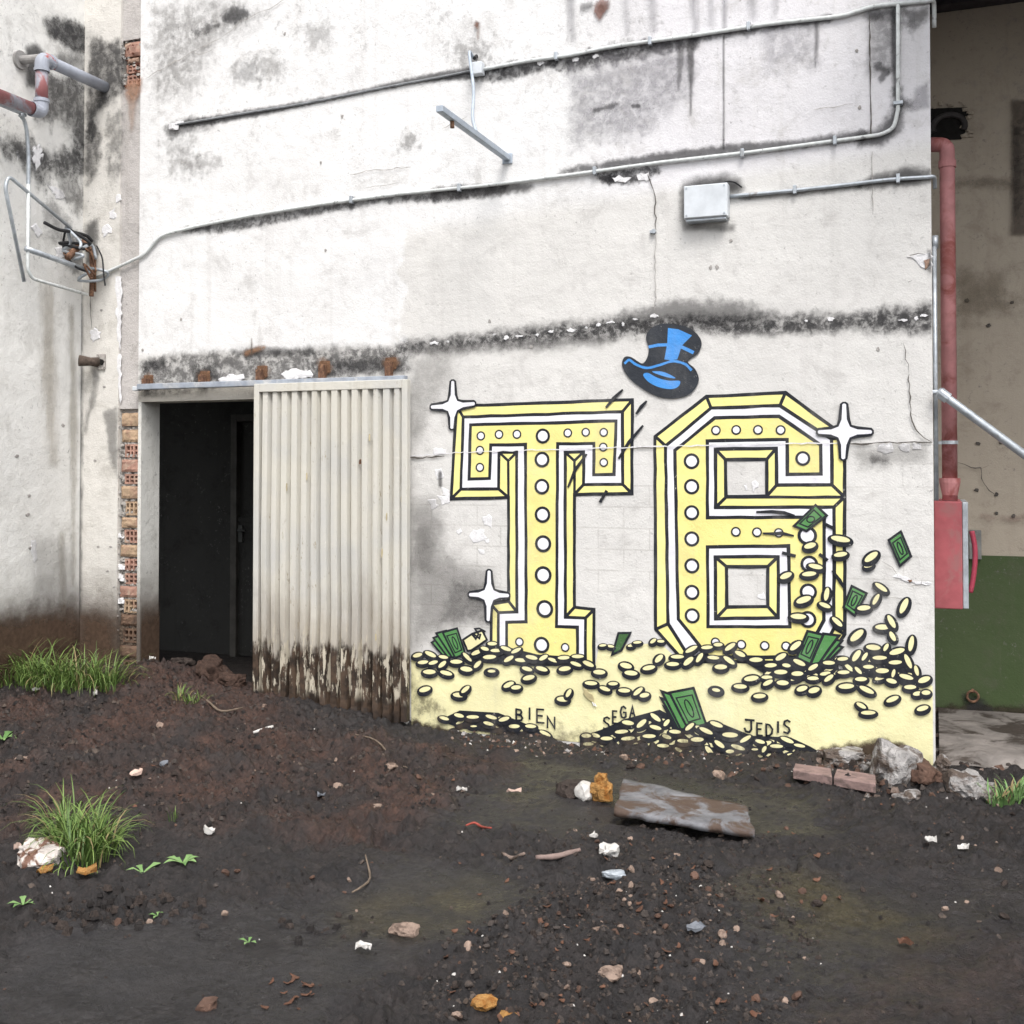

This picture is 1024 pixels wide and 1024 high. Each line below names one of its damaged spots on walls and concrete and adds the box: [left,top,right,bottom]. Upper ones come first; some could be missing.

leakage [0,17,124,200]
leakage [179,15,830,127]
leakage [564,131,866,184]
leakage [86,221,98,262]
mould [140,305,932,395]
crack [410,343,932,459]
peeling [428,468,450,510]